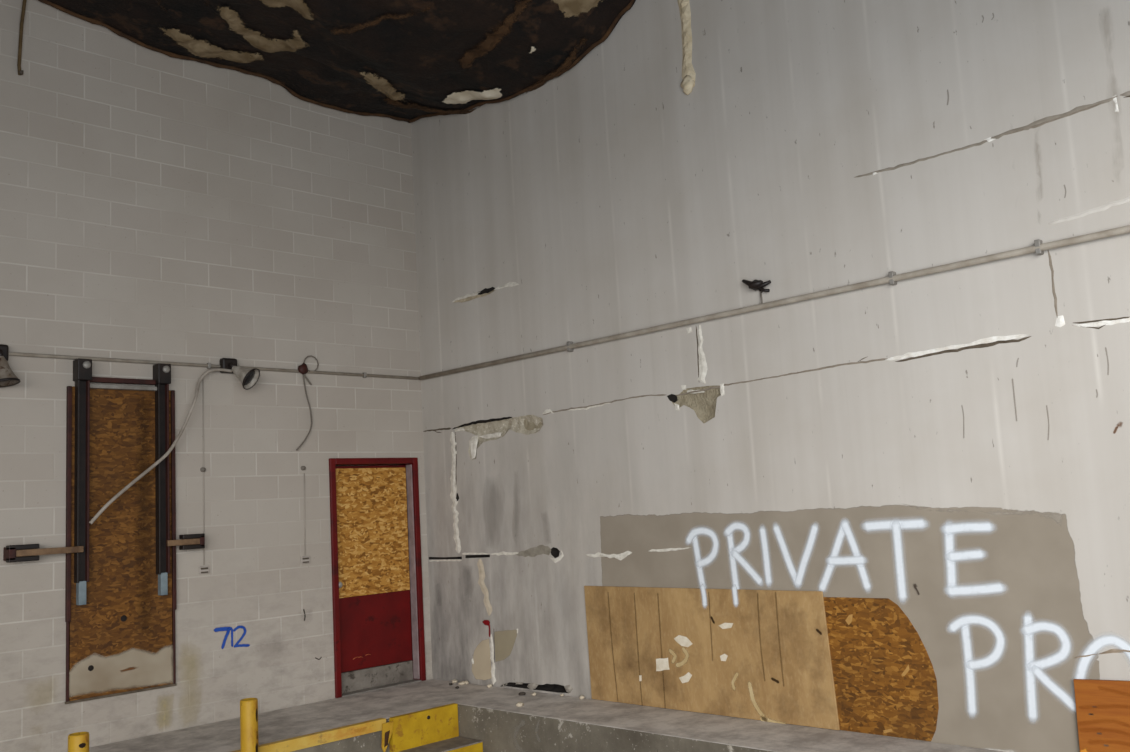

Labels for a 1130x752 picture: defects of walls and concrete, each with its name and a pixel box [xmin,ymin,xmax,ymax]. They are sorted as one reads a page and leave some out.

peeling [259,0,314,20]
peeling [551,0,604,18]
peeling [160,6,306,63]
peeling [526,38,587,93]
peeling [360,72,502,114]
spalling [667,383,725,423]
spalling [453,415,543,460]